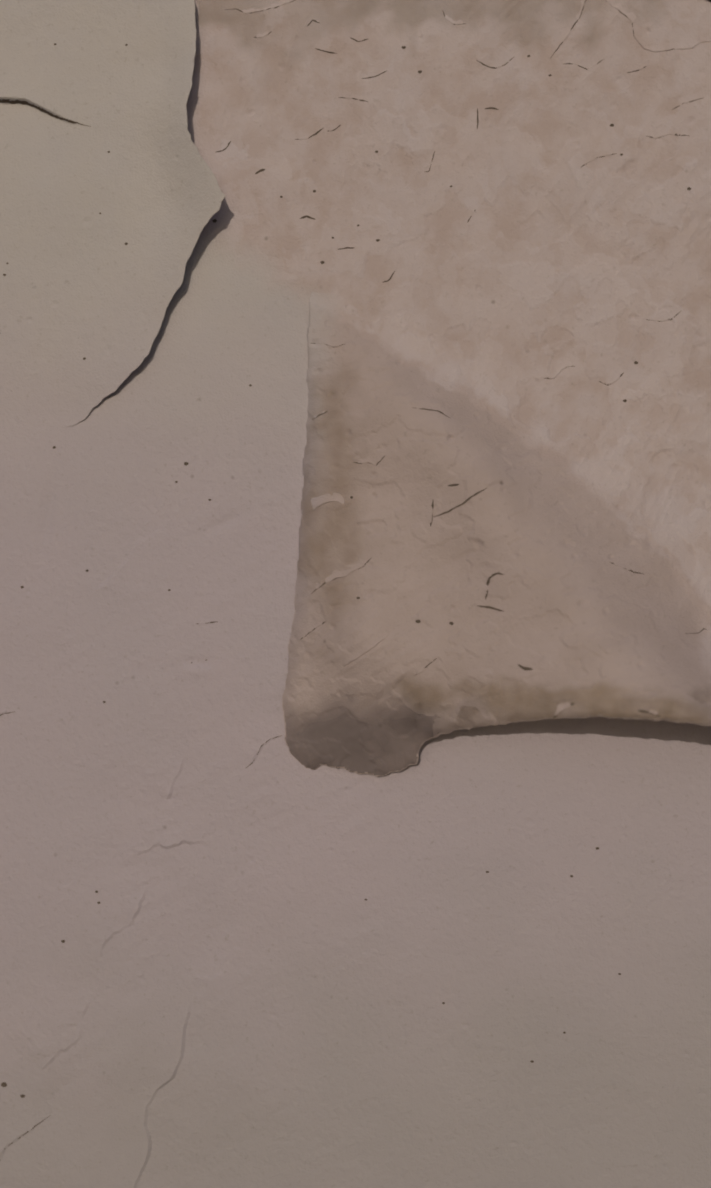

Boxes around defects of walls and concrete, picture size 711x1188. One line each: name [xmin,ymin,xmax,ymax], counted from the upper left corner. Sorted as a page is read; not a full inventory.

crack [0,99,91,127]
peeling [11,0,711,777]
crack [0,1116,49,1163]